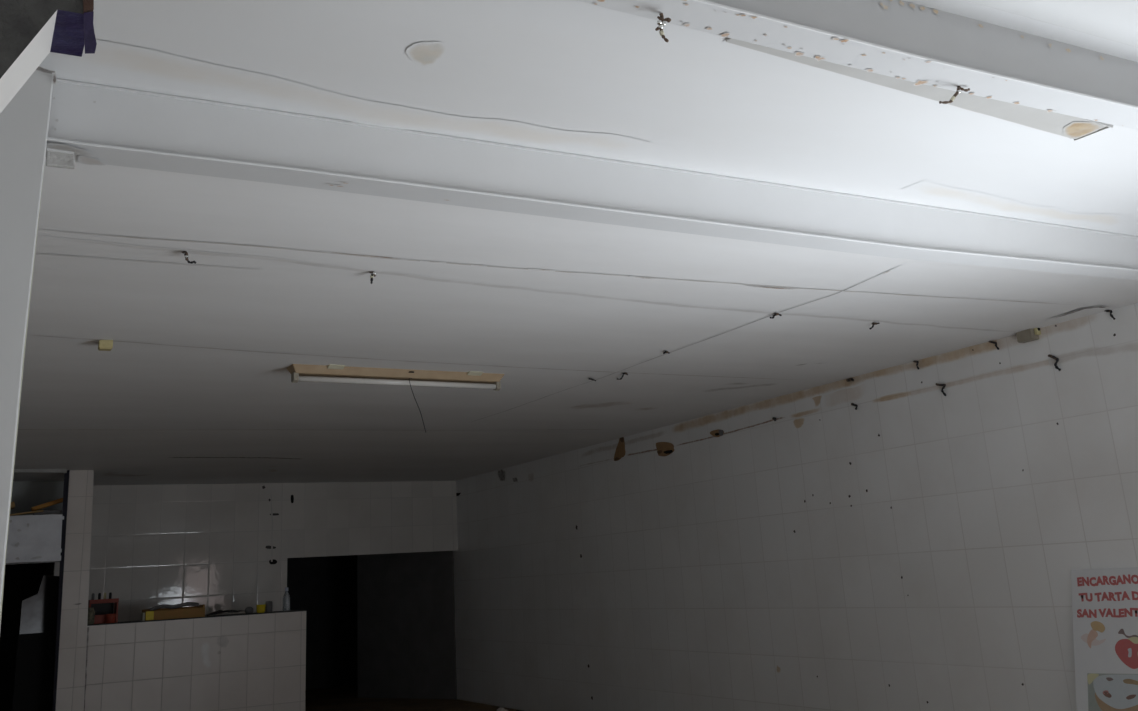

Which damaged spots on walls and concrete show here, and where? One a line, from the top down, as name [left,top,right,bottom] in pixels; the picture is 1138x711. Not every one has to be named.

water stain [45,40,650,160]
spalling [614,437,625,461]
spalling [656,442,674,456]